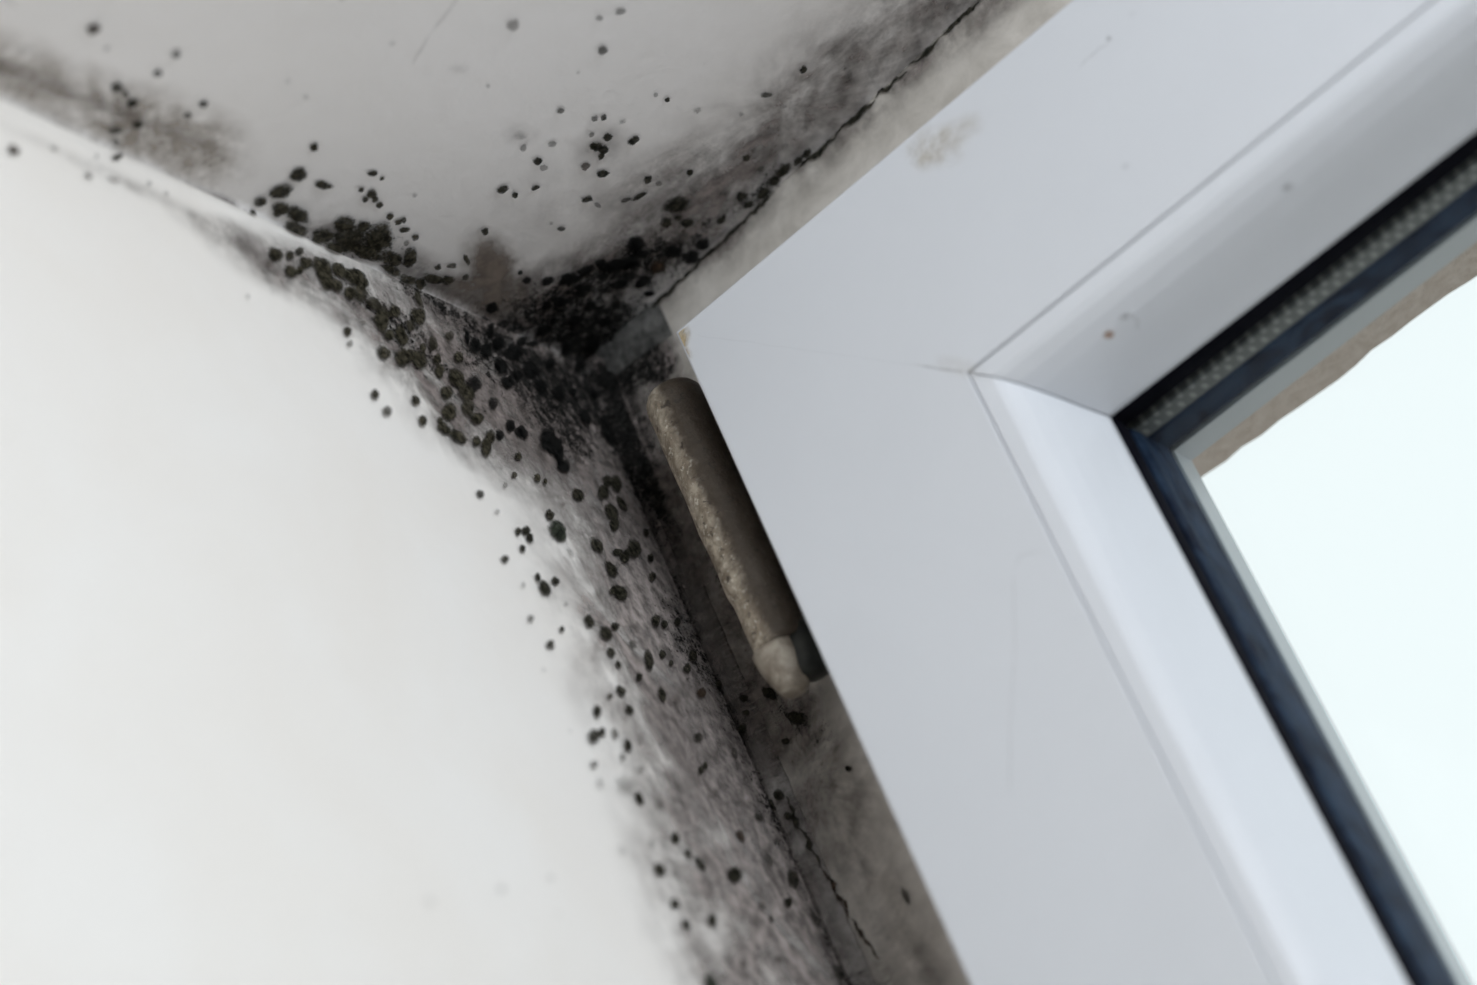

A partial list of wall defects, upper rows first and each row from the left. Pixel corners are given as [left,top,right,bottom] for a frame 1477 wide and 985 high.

damp [91,83,224,187]
damp [212,0,999,985]